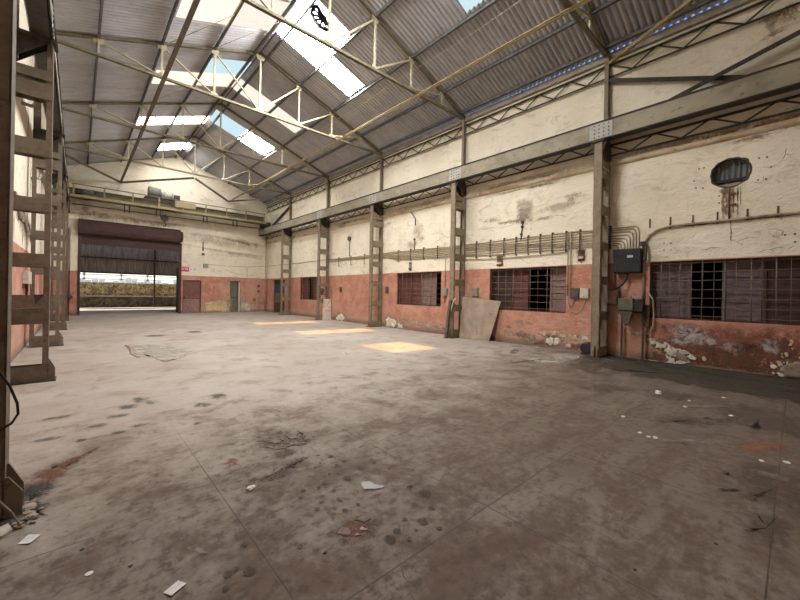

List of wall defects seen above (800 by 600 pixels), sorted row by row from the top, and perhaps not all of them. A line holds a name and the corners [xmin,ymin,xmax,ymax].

corrosion [678,187,795,239]
peeling [525,331,588,348]
peeling [644,323,745,364]
flaking render [762,339,800,378]
spalling [257,430,314,450]